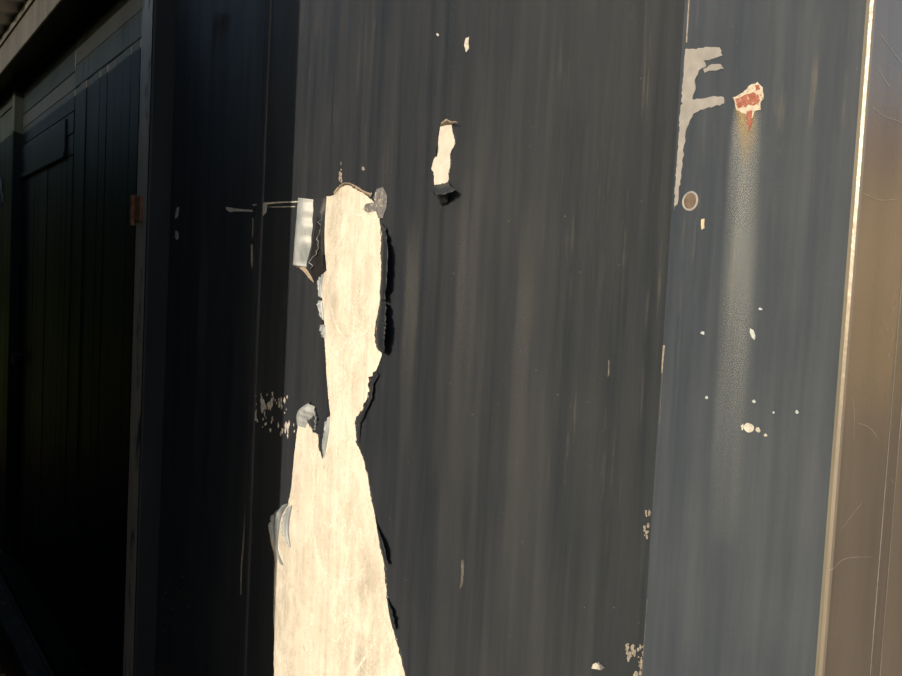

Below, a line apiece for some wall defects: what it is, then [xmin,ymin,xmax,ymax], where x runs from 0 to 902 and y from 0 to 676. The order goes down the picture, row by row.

peeling [427,119,458,205]
peeling [674,47,725,209]
corrosion [733,82,764,147]
peeling [255,162,406,676]
peeling [741,423,767,437]
peeling [625,643,643,676]